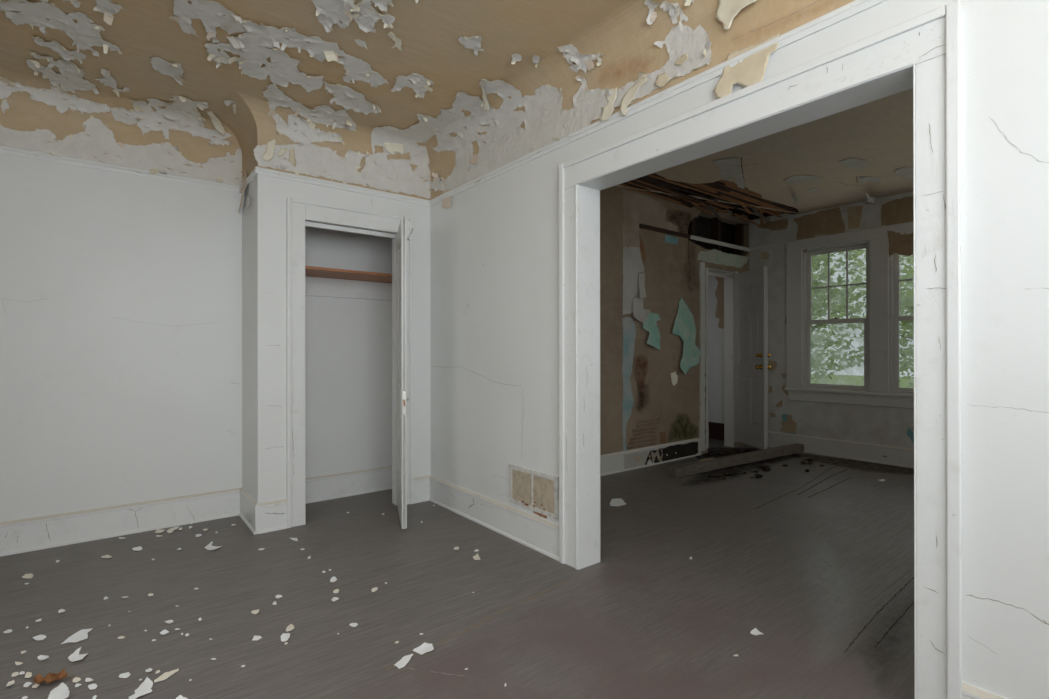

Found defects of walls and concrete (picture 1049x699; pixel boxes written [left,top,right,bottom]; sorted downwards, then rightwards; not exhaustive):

peeling [0,0,756,214]
crack [989,117,1049,163]
peeling [895,167,913,179]
spalling [758,206,863,253]
spalling [881,196,913,226]
spalling [697,249,770,329]
crack [968,595,1049,625]